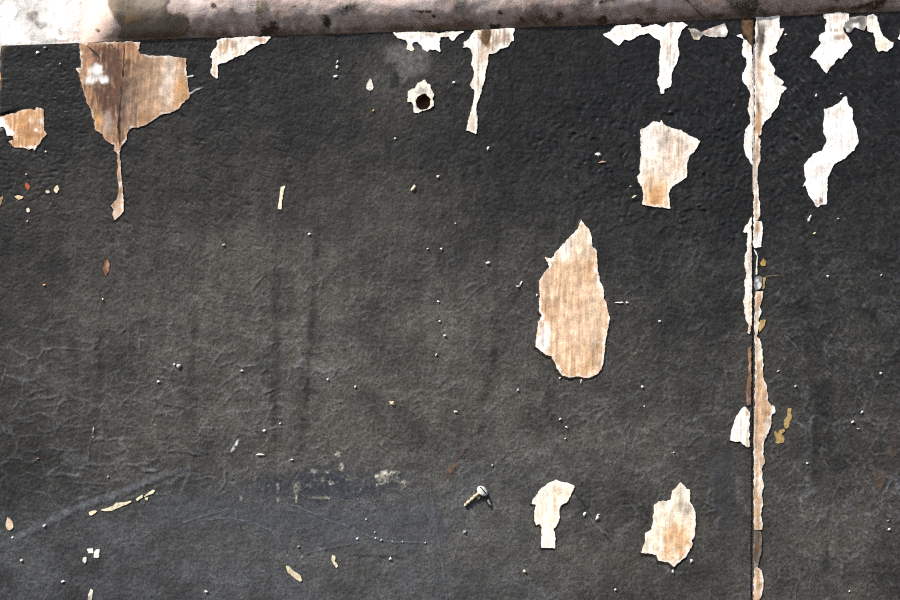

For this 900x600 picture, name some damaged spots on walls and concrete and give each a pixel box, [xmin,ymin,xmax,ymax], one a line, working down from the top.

peeling [0,107,47,151]
peeling [75,41,190,222]
peeling [210,36,271,79]
peeling [393,28,515,135]
peeling [802,96,859,208]
peeling [810,12,900,74]
peeling [532,220,610,382]
peeling [603,16,792,600]
peeling [529,480,575,551]